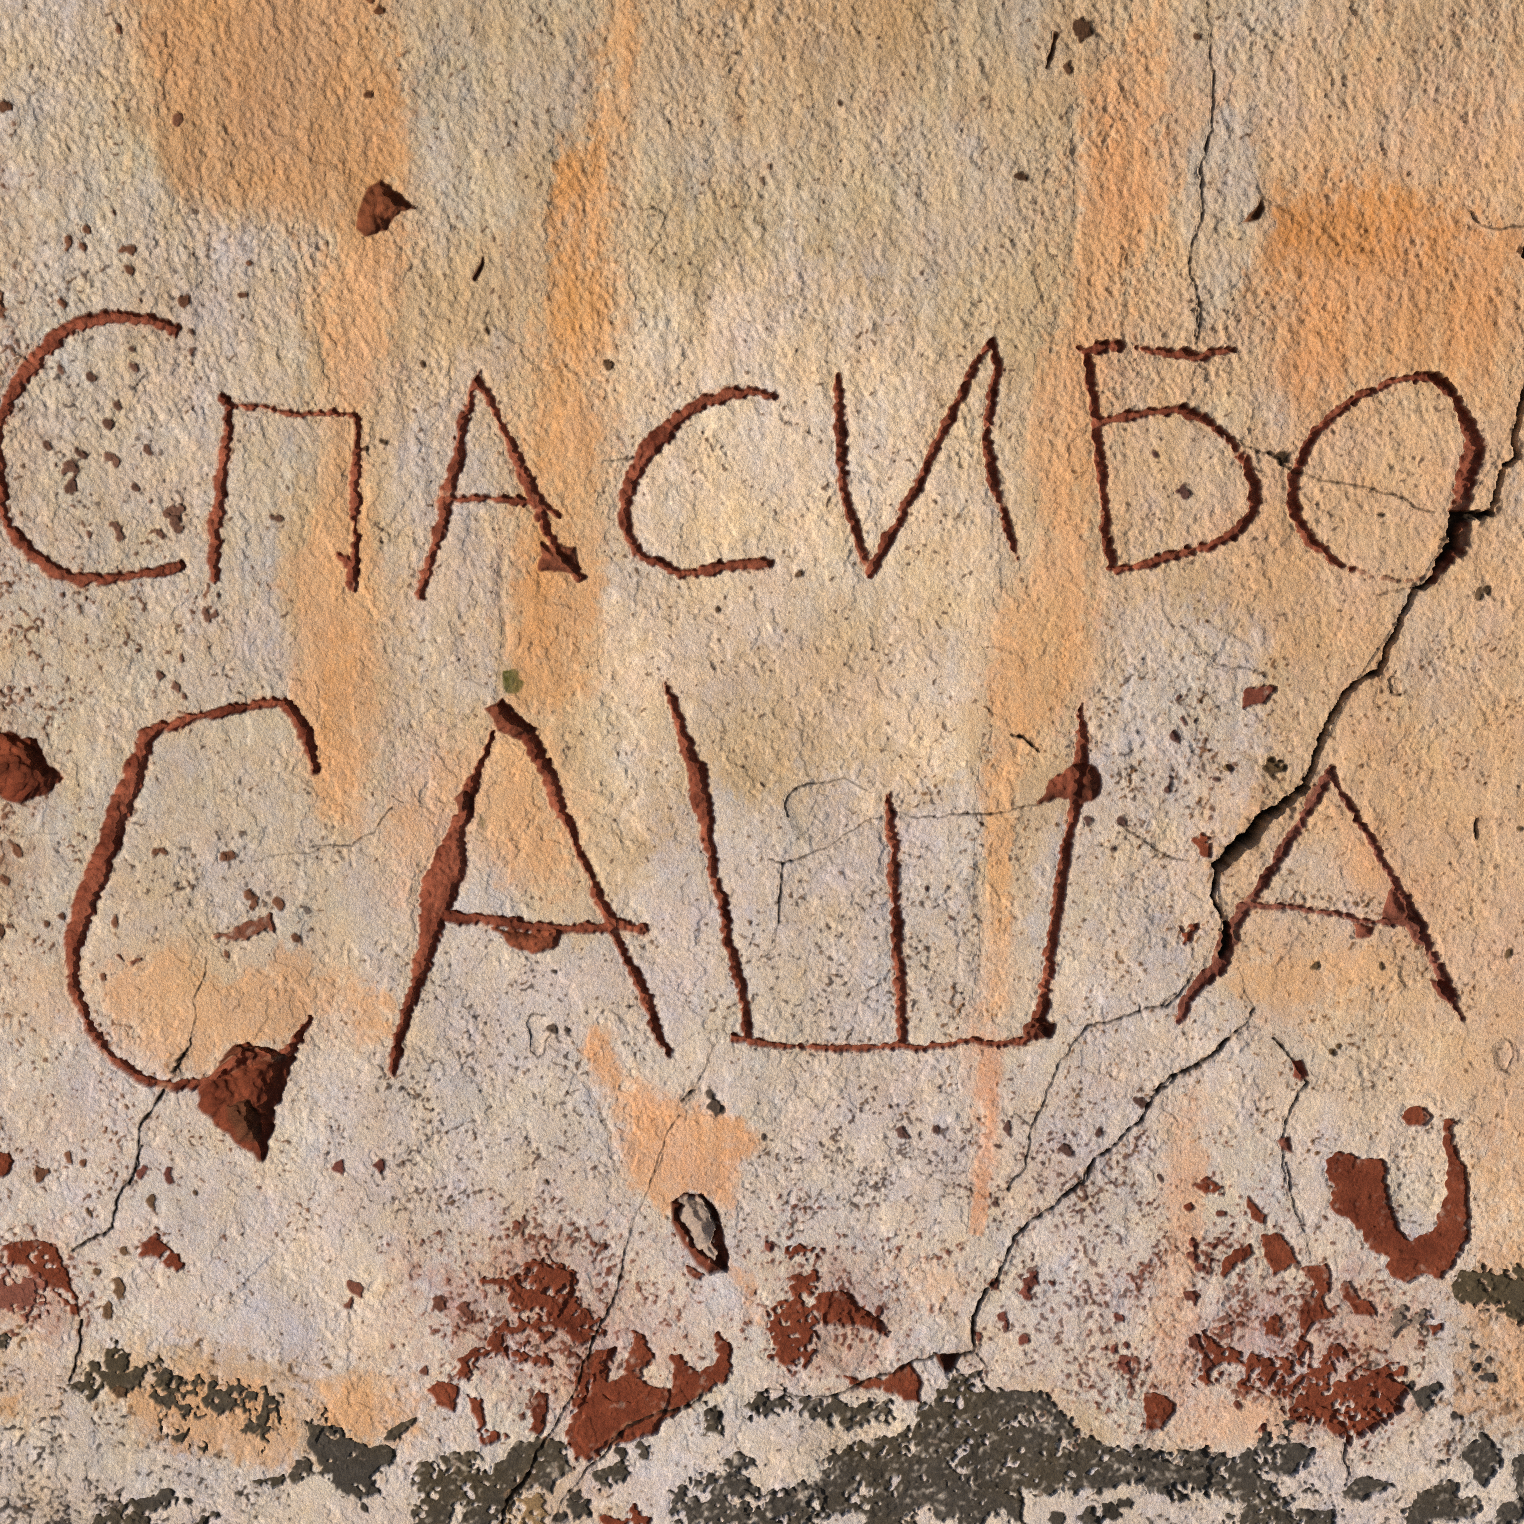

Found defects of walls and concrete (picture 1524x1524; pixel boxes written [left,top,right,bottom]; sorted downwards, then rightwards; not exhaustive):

crack [1186,0,1216,383]
crack [1462,204,1524,259]
spalling [0,731,65,805]
crack [757,385,1524,1400]
peeling [0,1239,79,1350]
peeling [0,1150,87,1184]
peeling [118,1232,185,1274]
peeling [1325,1106,1524,1327]
peeling [408,1195,1464,1524]
peeling [91,1488,222,1524]
peeling [64,1339,417,1514]
peeling [1400,1431,1524,1524]